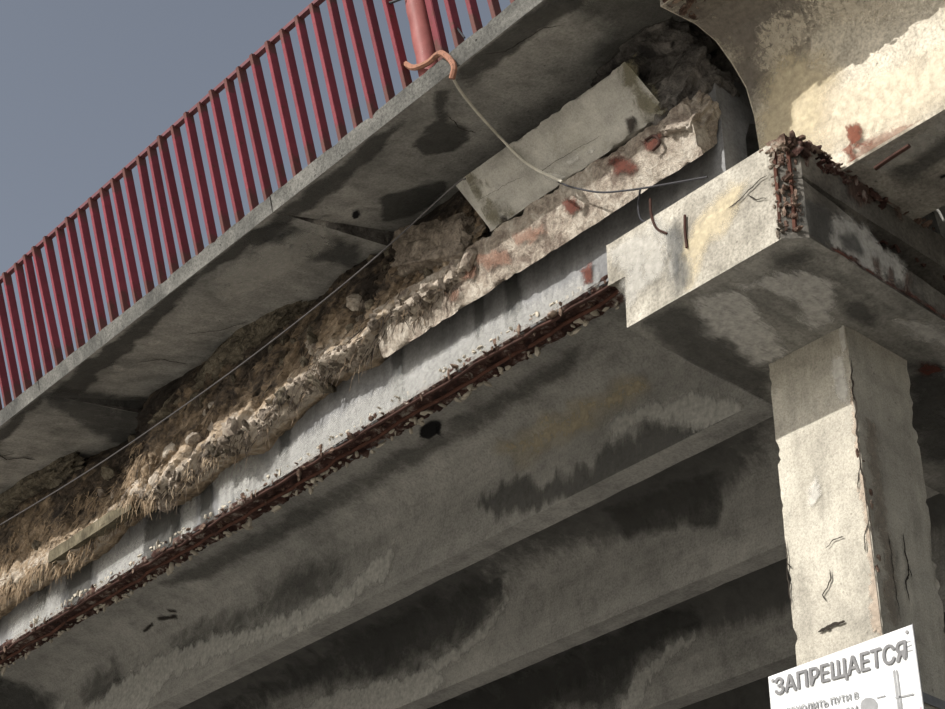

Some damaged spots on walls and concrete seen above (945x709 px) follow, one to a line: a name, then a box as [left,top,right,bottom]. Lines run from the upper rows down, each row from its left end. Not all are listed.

corrosion [562,198,582,214]
corrosion [607,156,637,175]
spalling [759,121,935,239]
damp [804,202,906,285]
corrosion [842,123,871,162]
spalling [0,100,717,676]
damp [479,381,741,516]
damp [645,254,873,399]
crack [818,360,912,632]
damp [85,547,394,709]
damp [221,578,509,709]
damp [432,610,699,709]